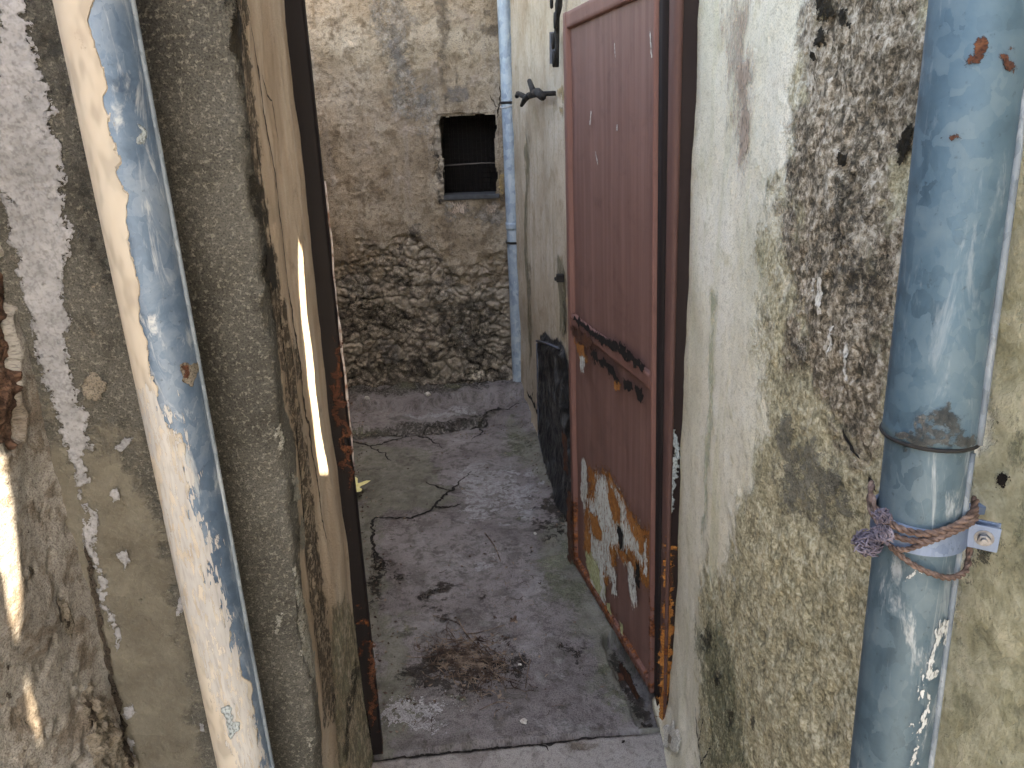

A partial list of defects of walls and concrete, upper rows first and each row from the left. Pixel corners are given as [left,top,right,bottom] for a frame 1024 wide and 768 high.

damp [26,0,75,109]
rust [966,36,1015,73]
peeling [136,123,147,145]
damp [65,127,113,289]
damp [811,148,890,381]
peeling [0,0,122,650]
rust [570,316,645,372]
peeling [115,437,133,452]
crack [353,382,537,460]
peeling [116,551,131,571]
crack [370,471,472,573]
rust [566,461,678,720]